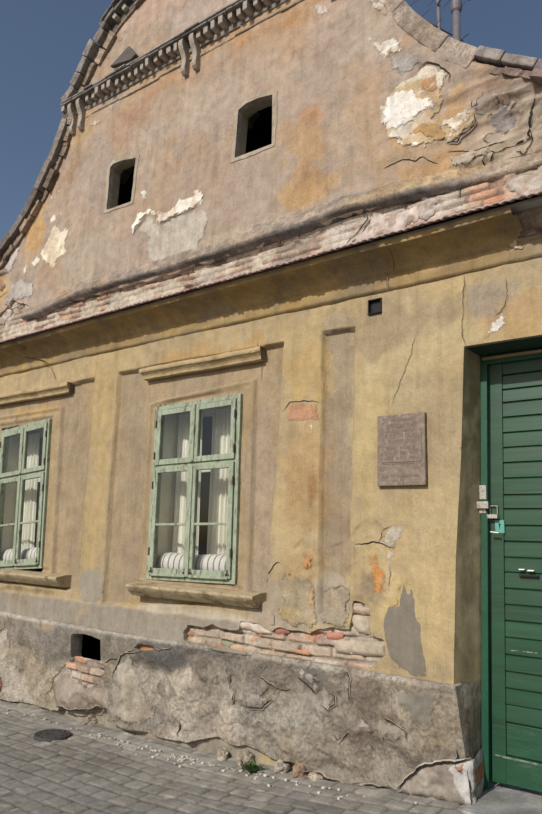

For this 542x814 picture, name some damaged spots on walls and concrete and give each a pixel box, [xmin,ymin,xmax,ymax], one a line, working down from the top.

flaking render [368,37,402,58]
flaking render [380,61,477,147]
crack [385,92,542,173]
flaking render [0,165,542,341]
crack [460,277,468,344]
crack [495,277,508,316]
flaking render [66,656,105,688]
flaking render [109,655,155,724]
crack [238,657,289,707]
flaking render [187,601,385,713]
crack [304,749,470,792]
flaking render [397,747,484,805]